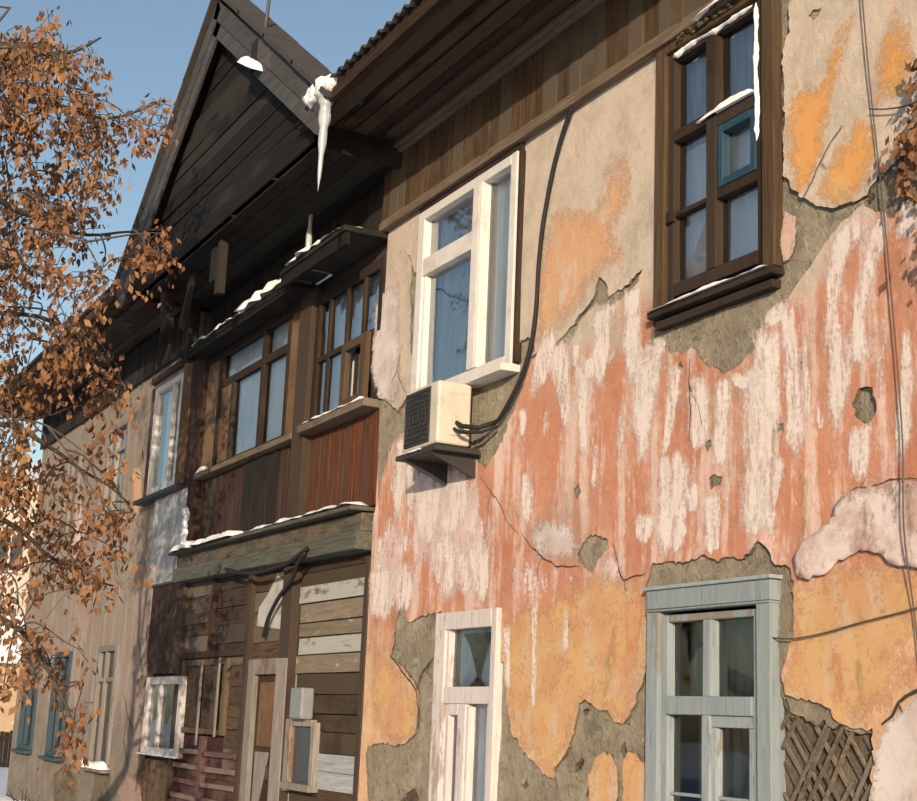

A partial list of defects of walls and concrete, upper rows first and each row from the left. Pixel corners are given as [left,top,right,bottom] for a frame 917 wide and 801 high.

spalling [649,0,917,374]
peeling [466,157,642,469]
spalling [852,387,877,426]
crack [480,476,576,581]
crack [613,544,645,593]
spalling [366,606,442,801]
peeling [497,534,917,801]
crack [881,689,917,725]